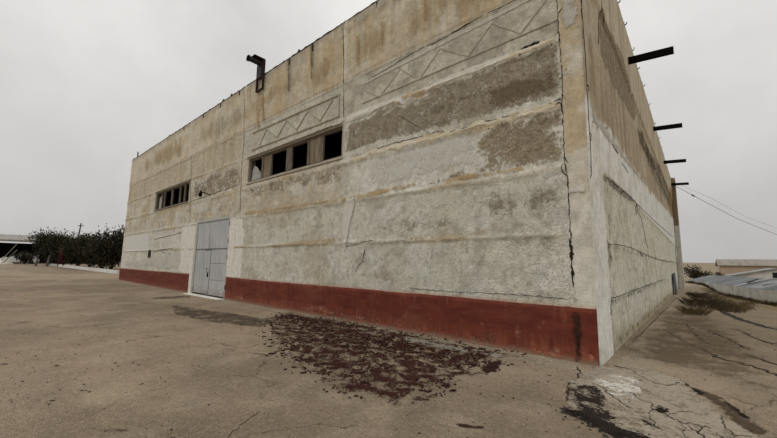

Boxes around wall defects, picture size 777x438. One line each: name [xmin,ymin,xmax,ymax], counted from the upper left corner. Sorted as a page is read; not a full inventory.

crack [340,37,348,117]
crack [378,115,467,149]
crack [368,0,515,80]
spalling [346,43,568,152]
spalling [477,110,565,176]
crack [469,0,575,299]
crack [581,0,673,308]
spalling [598,8,657,170]
leakage [572,312,582,361]